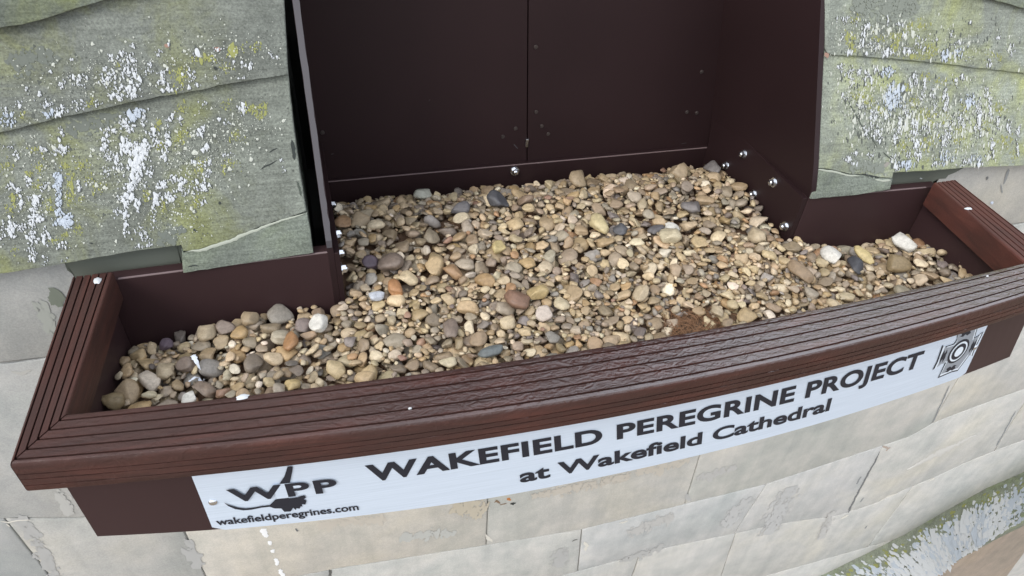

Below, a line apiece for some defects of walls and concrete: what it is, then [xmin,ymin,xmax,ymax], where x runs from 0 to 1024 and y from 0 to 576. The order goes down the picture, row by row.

water stain [65,110,130,140]
water stain [65,223,187,278]
crack [848,446,891,528]